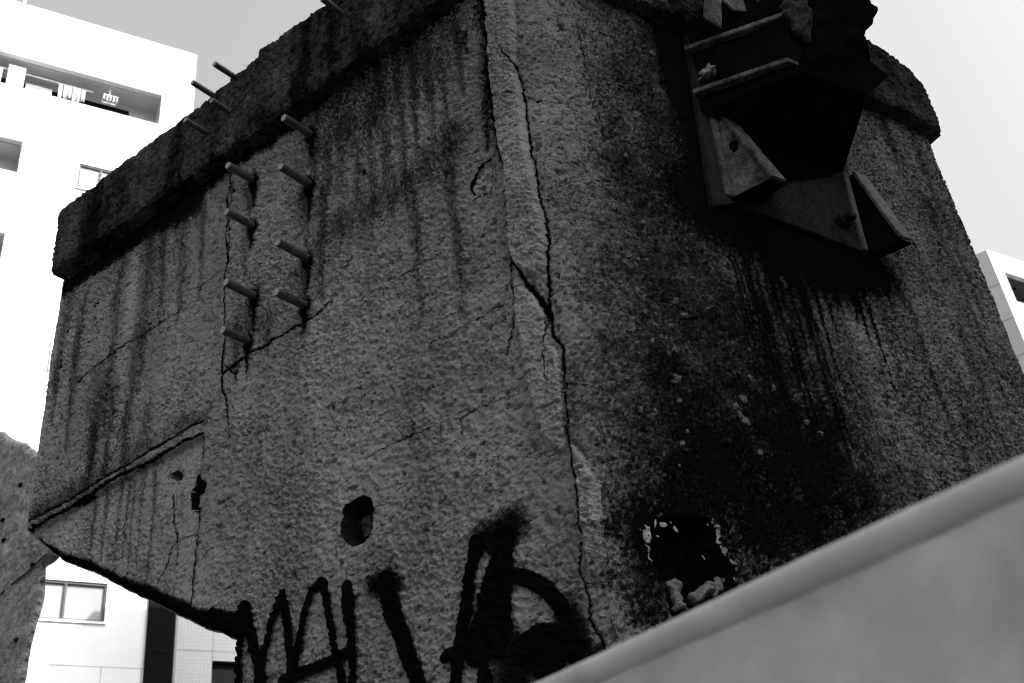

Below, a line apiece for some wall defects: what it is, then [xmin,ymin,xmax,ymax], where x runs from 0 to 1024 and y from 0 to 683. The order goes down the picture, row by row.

crack [0,172,331,604]
spalling [168,469,207,513]
water stain [31,0,502,639]
spalling [340,495,374,546]
crack [430,0,611,649]
spalling [638,513,738,617]
water stain [555,1,925,638]